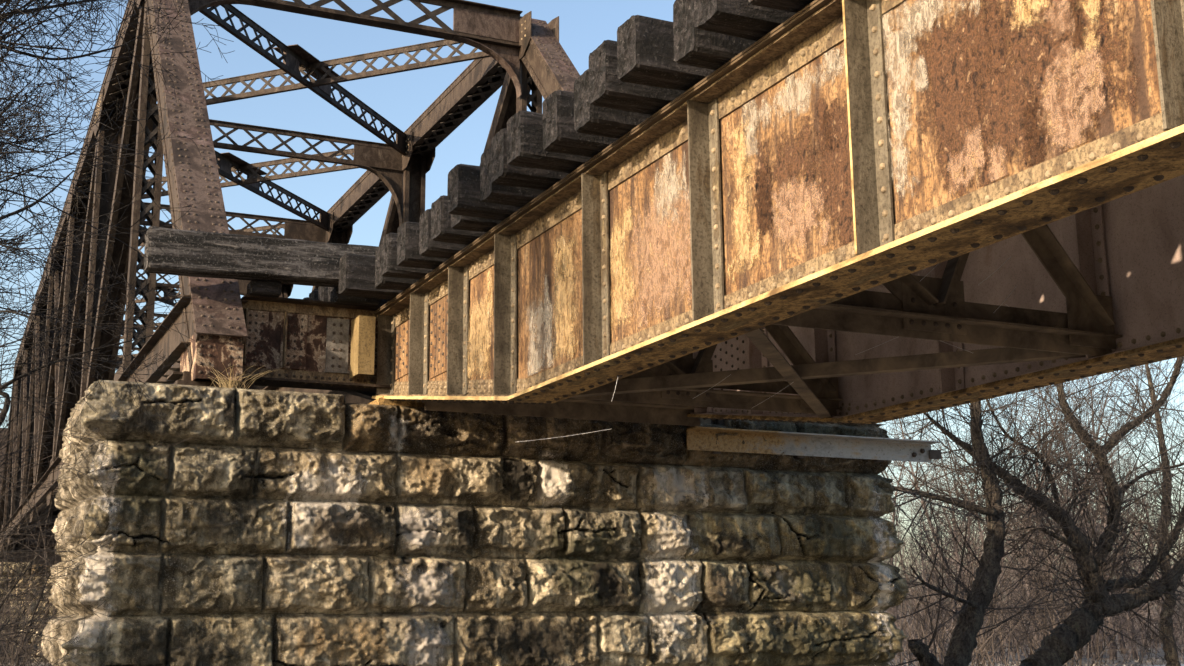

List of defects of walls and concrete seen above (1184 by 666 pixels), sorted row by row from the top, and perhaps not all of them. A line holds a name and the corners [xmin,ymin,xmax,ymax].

rust [912,0,1140,196]
rust [753,93,854,246]
crack [106,531,169,545]
crack [557,519,616,534]
crack [771,512,811,555]